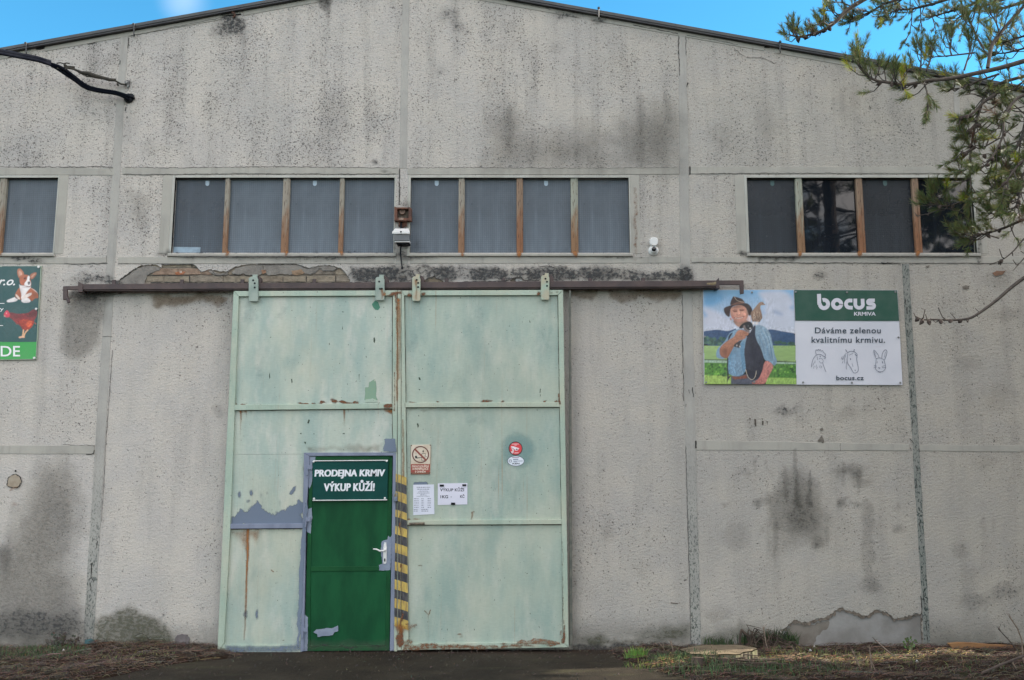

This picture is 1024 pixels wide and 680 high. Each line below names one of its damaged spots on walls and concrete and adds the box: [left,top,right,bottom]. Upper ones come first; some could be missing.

water stain [216,17,246,35]
spalling [119,264,350,284]
water stain [350,253,693,282]
rust [381,280,425,413]
peeling [299,379,377,404]
water stain [96,608,171,644]
rust [395,613,565,650]
spalling [780,607,923,646]